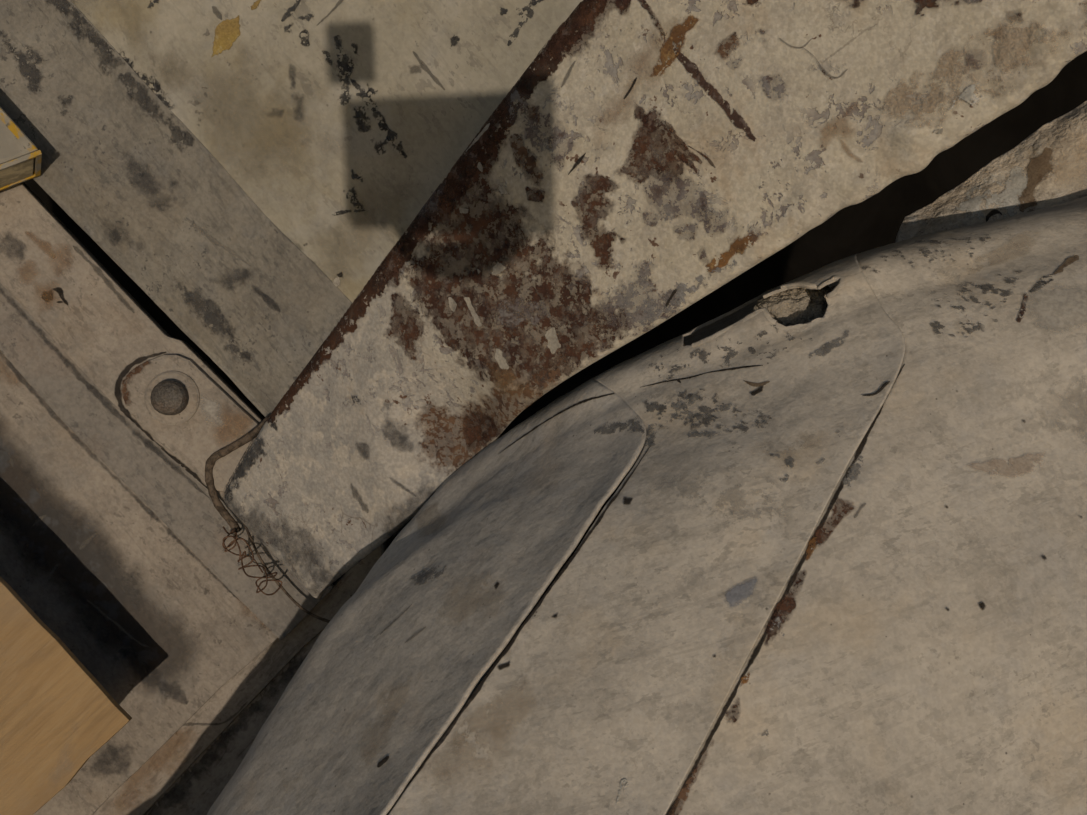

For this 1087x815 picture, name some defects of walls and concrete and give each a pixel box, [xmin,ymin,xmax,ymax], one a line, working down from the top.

rust [915,0,939,16]
rust [376,98,628,474]
peeling [645,389,772,447]
rust [765,499,854,644]